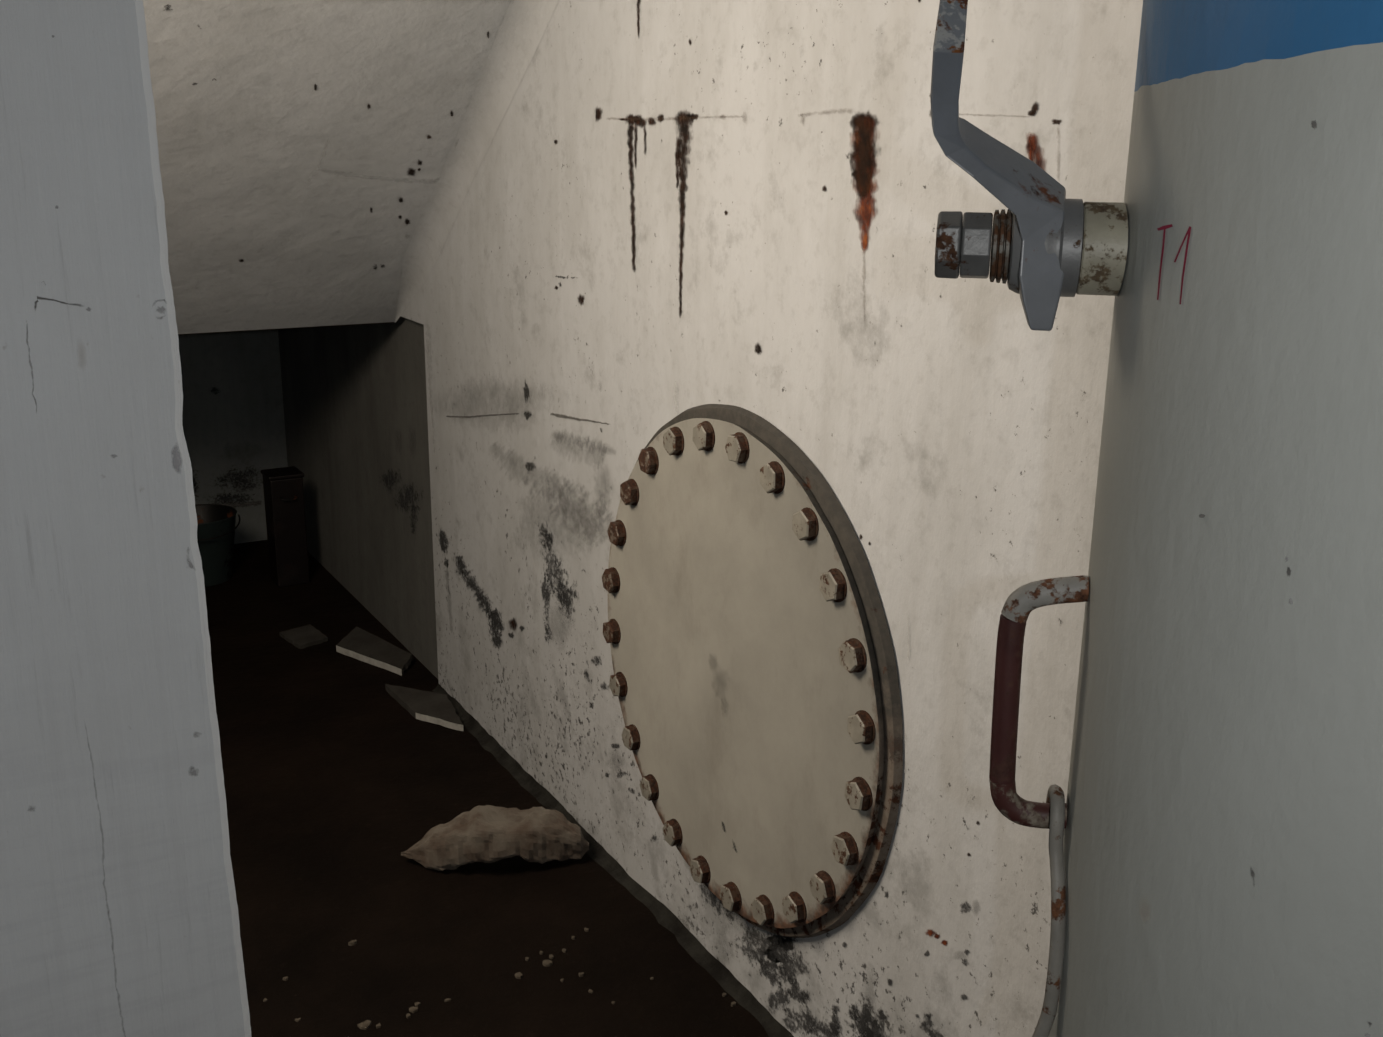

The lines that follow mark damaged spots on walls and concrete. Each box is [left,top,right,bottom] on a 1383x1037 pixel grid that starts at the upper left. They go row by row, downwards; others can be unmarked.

rust [620,112,698,315]
rust [850,112,877,250]
mould [439,529,524,648]
mould [539,523,576,641]
mould [701,884,890,1037]
mould [916,1013,943,1037]